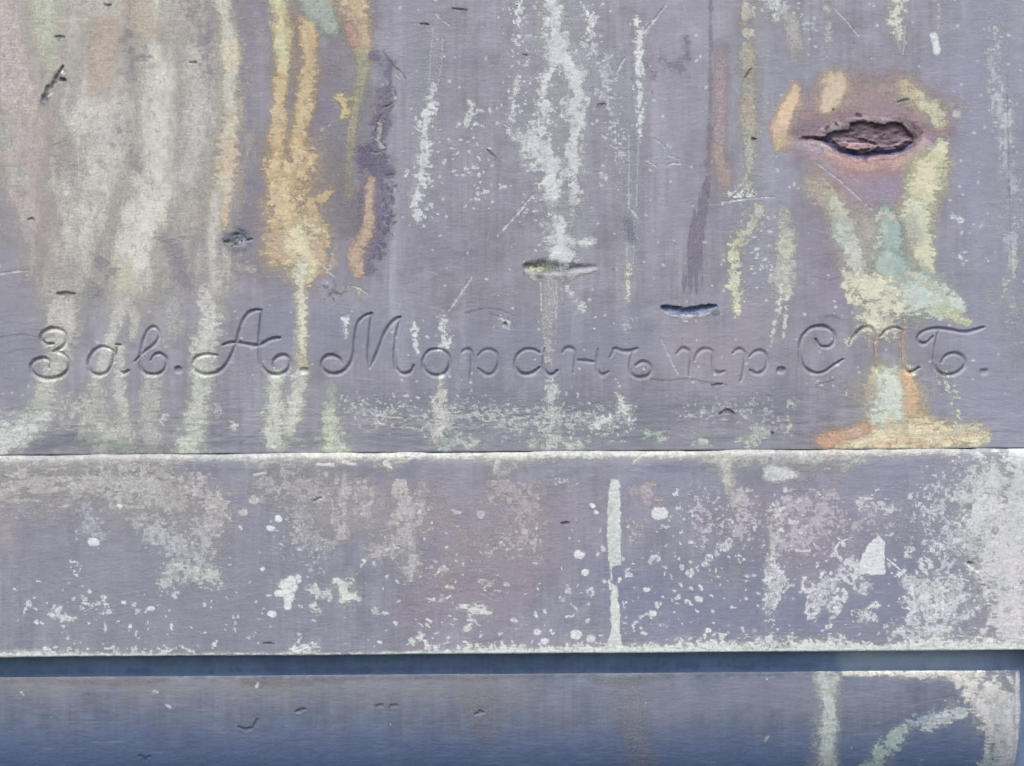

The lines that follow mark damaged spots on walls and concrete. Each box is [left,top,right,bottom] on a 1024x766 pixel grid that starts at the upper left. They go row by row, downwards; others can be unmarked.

spalling [799,109,922,160]
damp [291,0,656,363]
rust [712,0,954,348]
rust [258,0,376,437]
spalling [660,304,720,320]
rust [815,327,990,449]
damp [568,513,589,576]
damp [621,481,704,546]
damp [665,519,754,586]
damp [254,559,376,628]
damp [622,596,665,636]
damp [851,601,890,623]